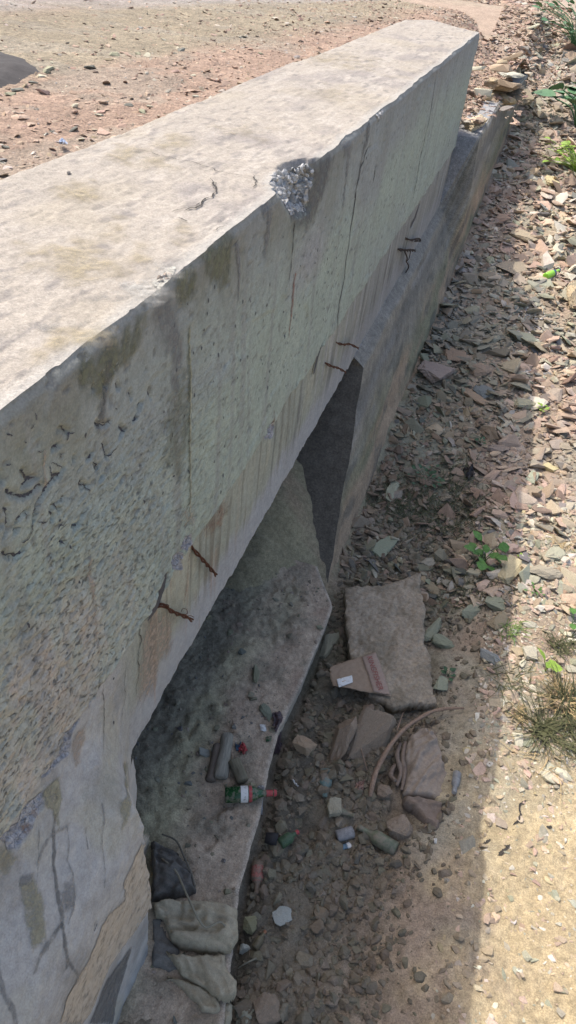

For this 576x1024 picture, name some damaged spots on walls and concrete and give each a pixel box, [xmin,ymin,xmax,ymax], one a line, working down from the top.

crack [152,152,257,221]